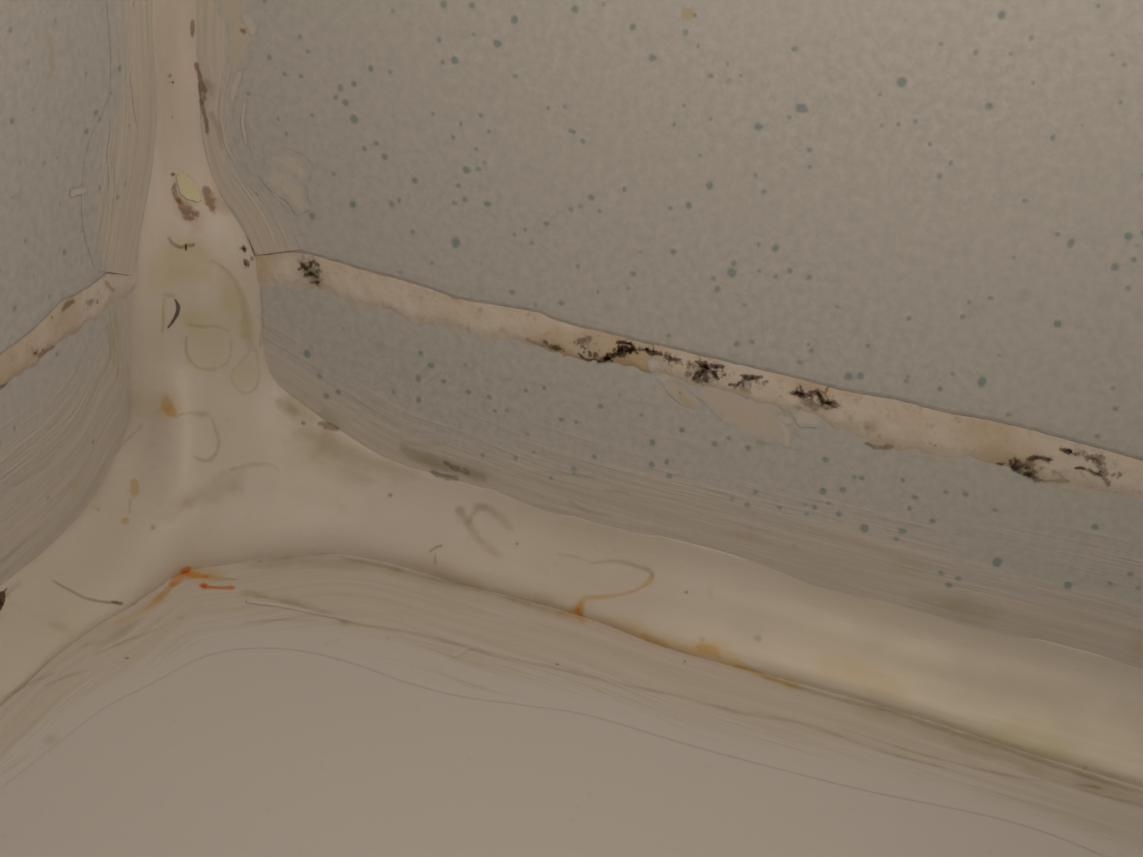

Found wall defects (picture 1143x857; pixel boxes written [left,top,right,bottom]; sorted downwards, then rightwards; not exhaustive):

damp [579,341,666,360]